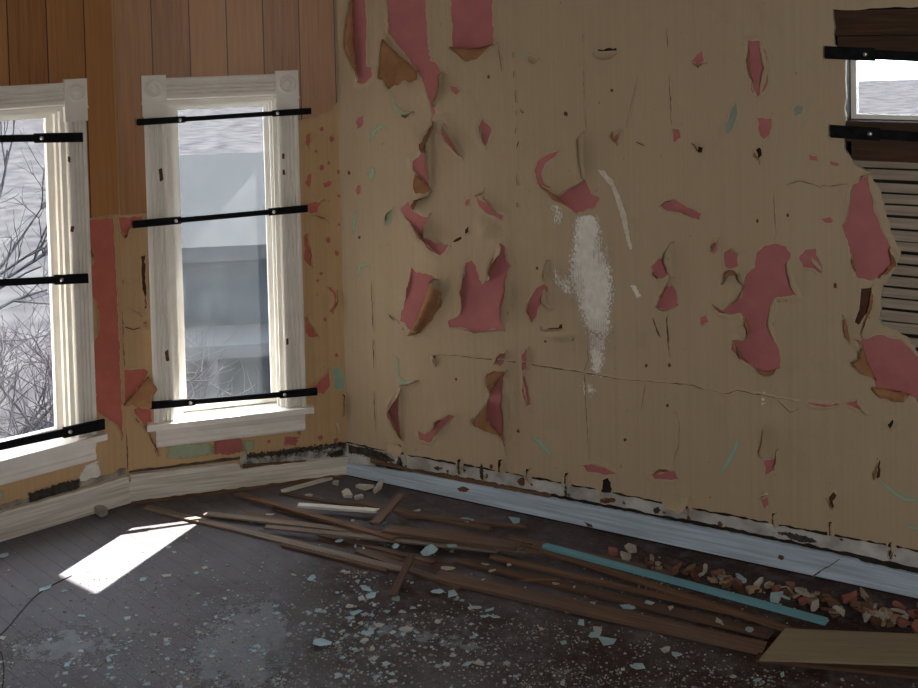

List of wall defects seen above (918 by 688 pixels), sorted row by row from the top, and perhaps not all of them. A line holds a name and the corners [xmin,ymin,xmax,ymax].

damp [551,206,617,402]
flaking render [79,435,918,573]